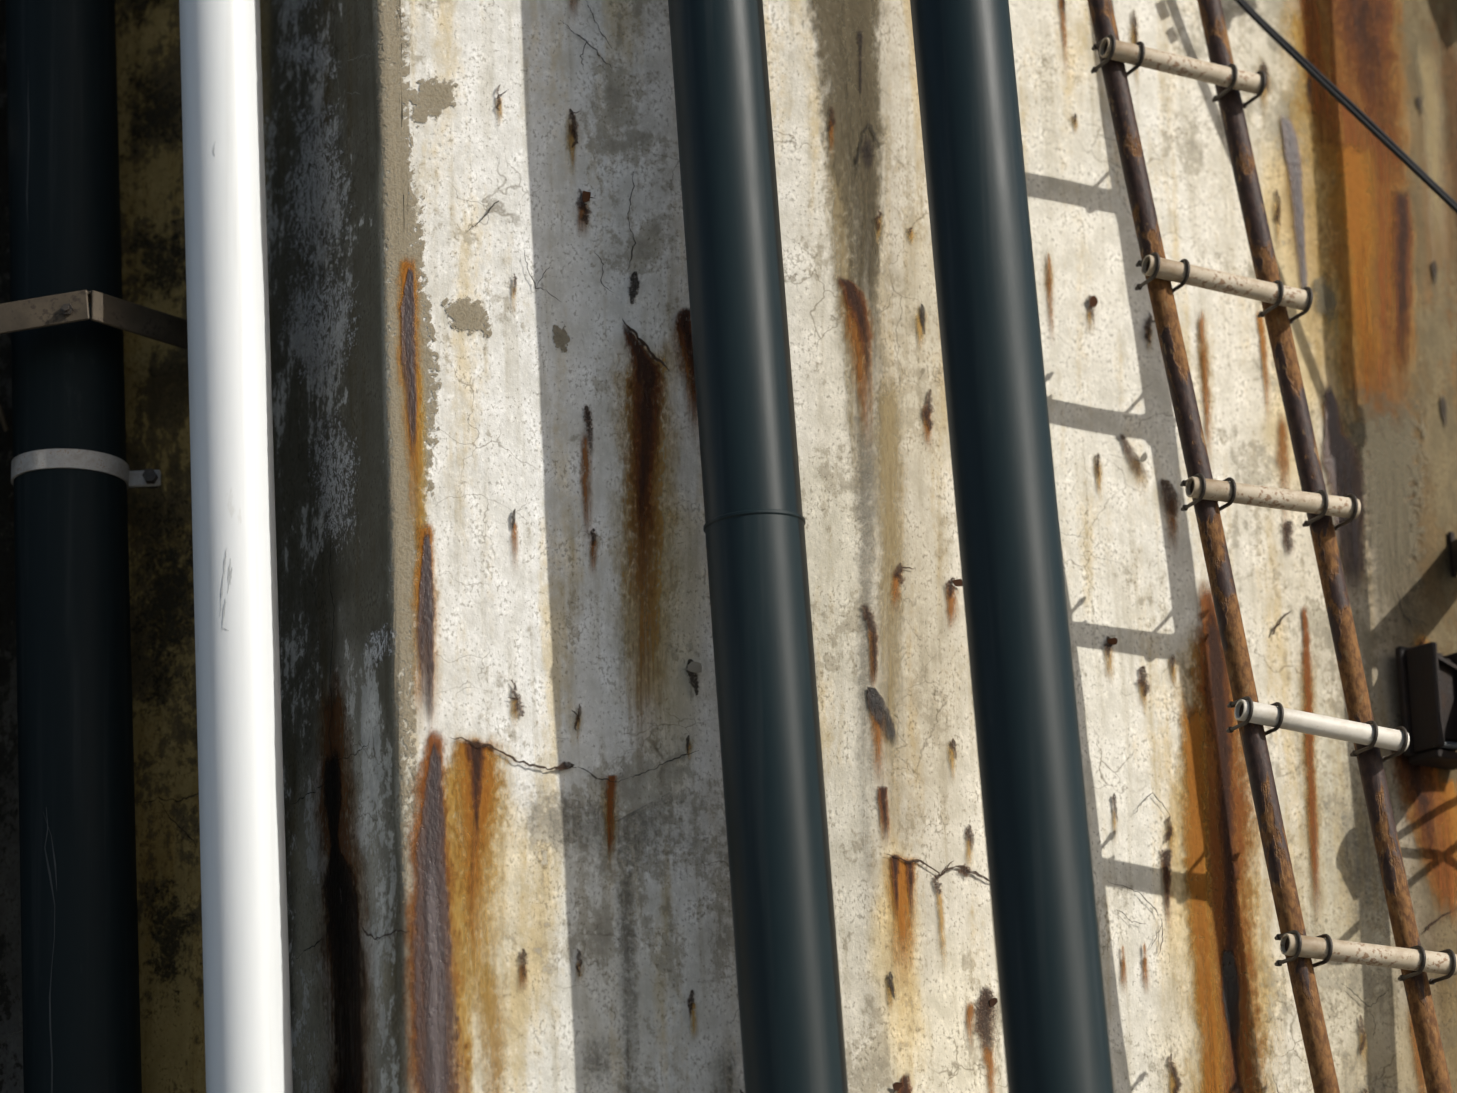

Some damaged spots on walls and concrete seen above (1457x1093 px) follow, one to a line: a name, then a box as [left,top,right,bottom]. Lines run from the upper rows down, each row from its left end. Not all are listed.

leakage [131,483,194,728]
leakage [276,0,361,563]
leakage [314,677,374,1093]
leakage [361,624,396,670]
corrosion [397,260,437,710]
corrosion [405,731,506,1093]
crack [450,737,700,783]
corrosion [615,308,697,700]
leakage [808,0,886,735]
crack [887,854,989,881]
corrosion [1161,586,1268,1093]
corrosion [1274,0,1414,580]